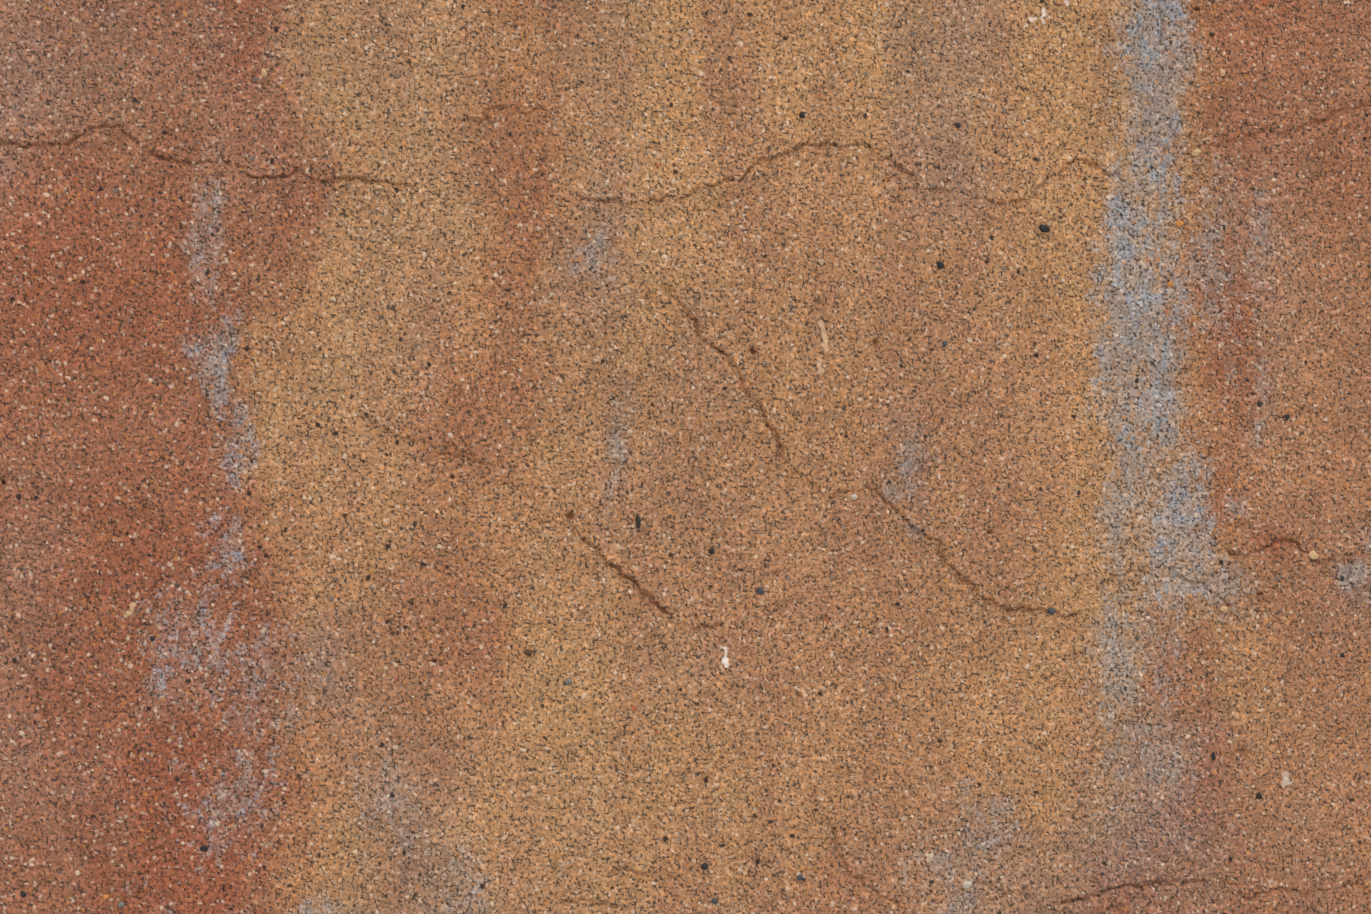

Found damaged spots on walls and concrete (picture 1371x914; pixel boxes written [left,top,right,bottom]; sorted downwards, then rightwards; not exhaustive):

crack [0,123,415,193]
crack [574,138,1130,211]
crack [584,279,1371,651]
crack [528,516,731,635]
crack [811,786,905,906]
crack [939,877,1371,911]